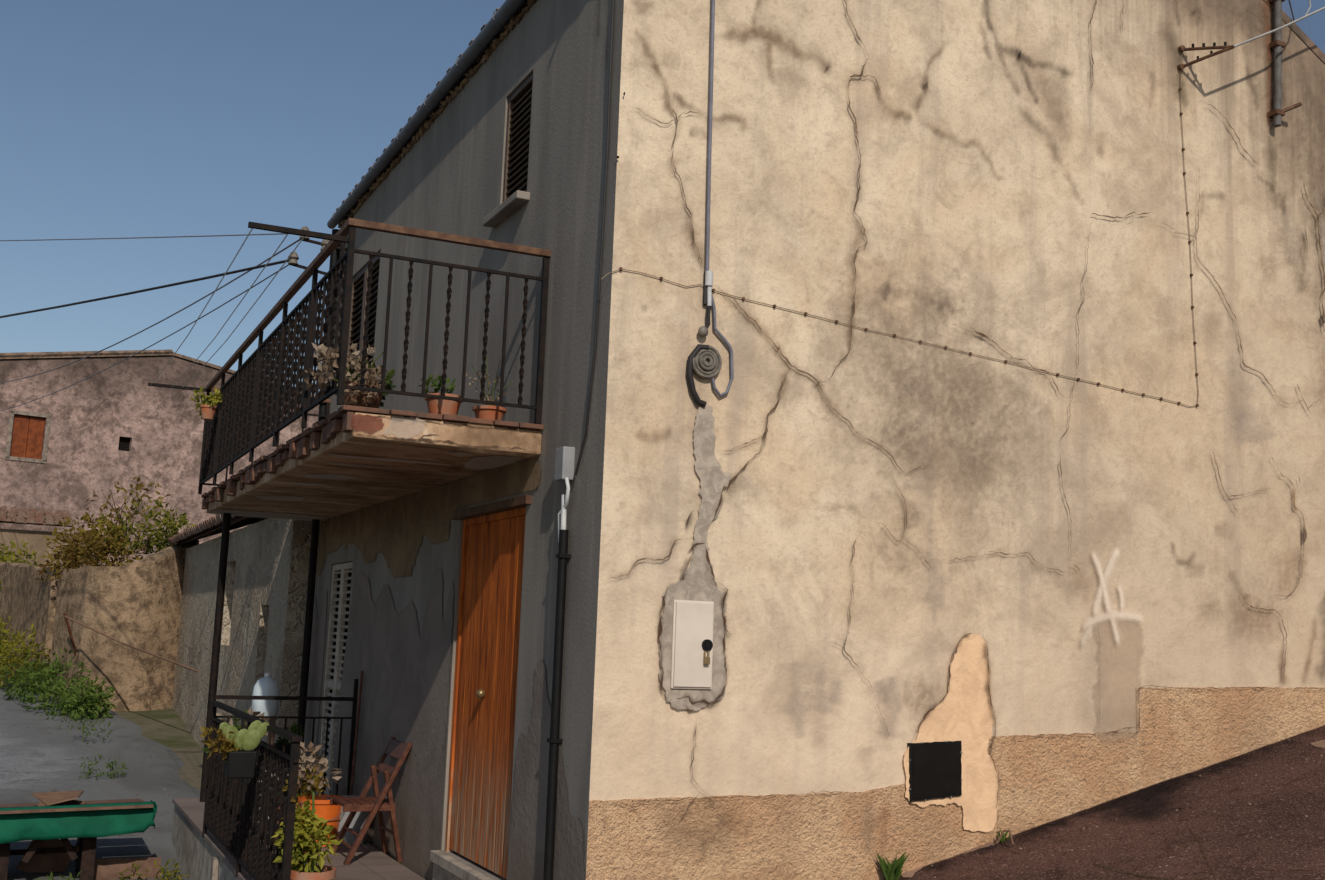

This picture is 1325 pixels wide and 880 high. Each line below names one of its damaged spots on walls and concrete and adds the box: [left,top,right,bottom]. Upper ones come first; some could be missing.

crack [601,0,1325,823]
peeling [296,456,541,880]
peeling [507,659,584,880]
peeling [904,633,999,832]